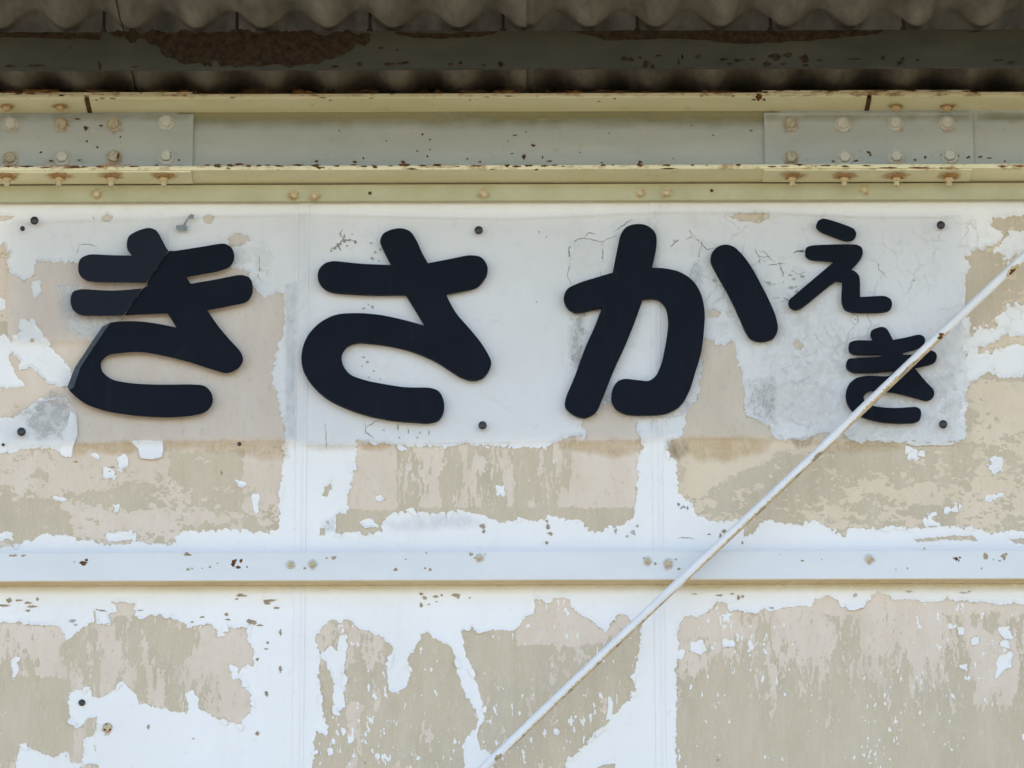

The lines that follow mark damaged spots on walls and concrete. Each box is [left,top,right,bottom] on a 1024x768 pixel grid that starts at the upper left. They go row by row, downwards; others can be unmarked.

corrosion [0,29,409,68]
corrosion [573,29,883,68]
corrosion [768,151,1023,179]
peeling [0,229,290,552]
peeling [316,209,1024,548]
peeling [0,597,269,768]
peeling [309,594,646,768]
peeling [670,587,1024,768]